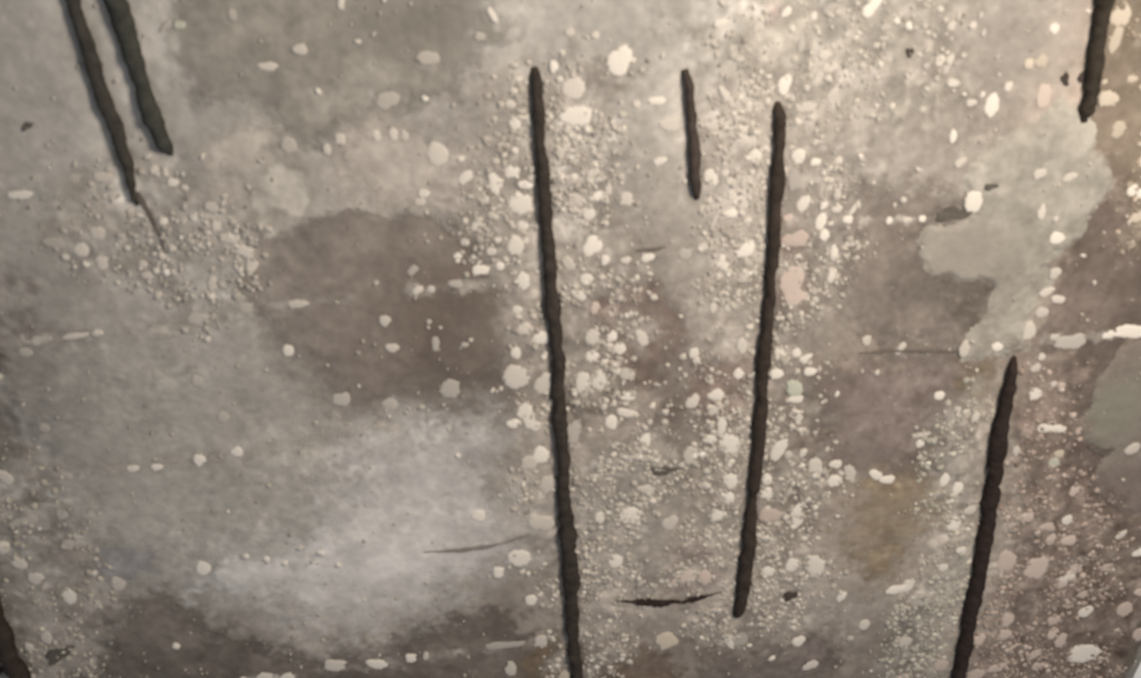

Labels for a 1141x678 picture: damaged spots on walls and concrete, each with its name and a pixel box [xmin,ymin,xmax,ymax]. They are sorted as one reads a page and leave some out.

crack [615,592,721,608]